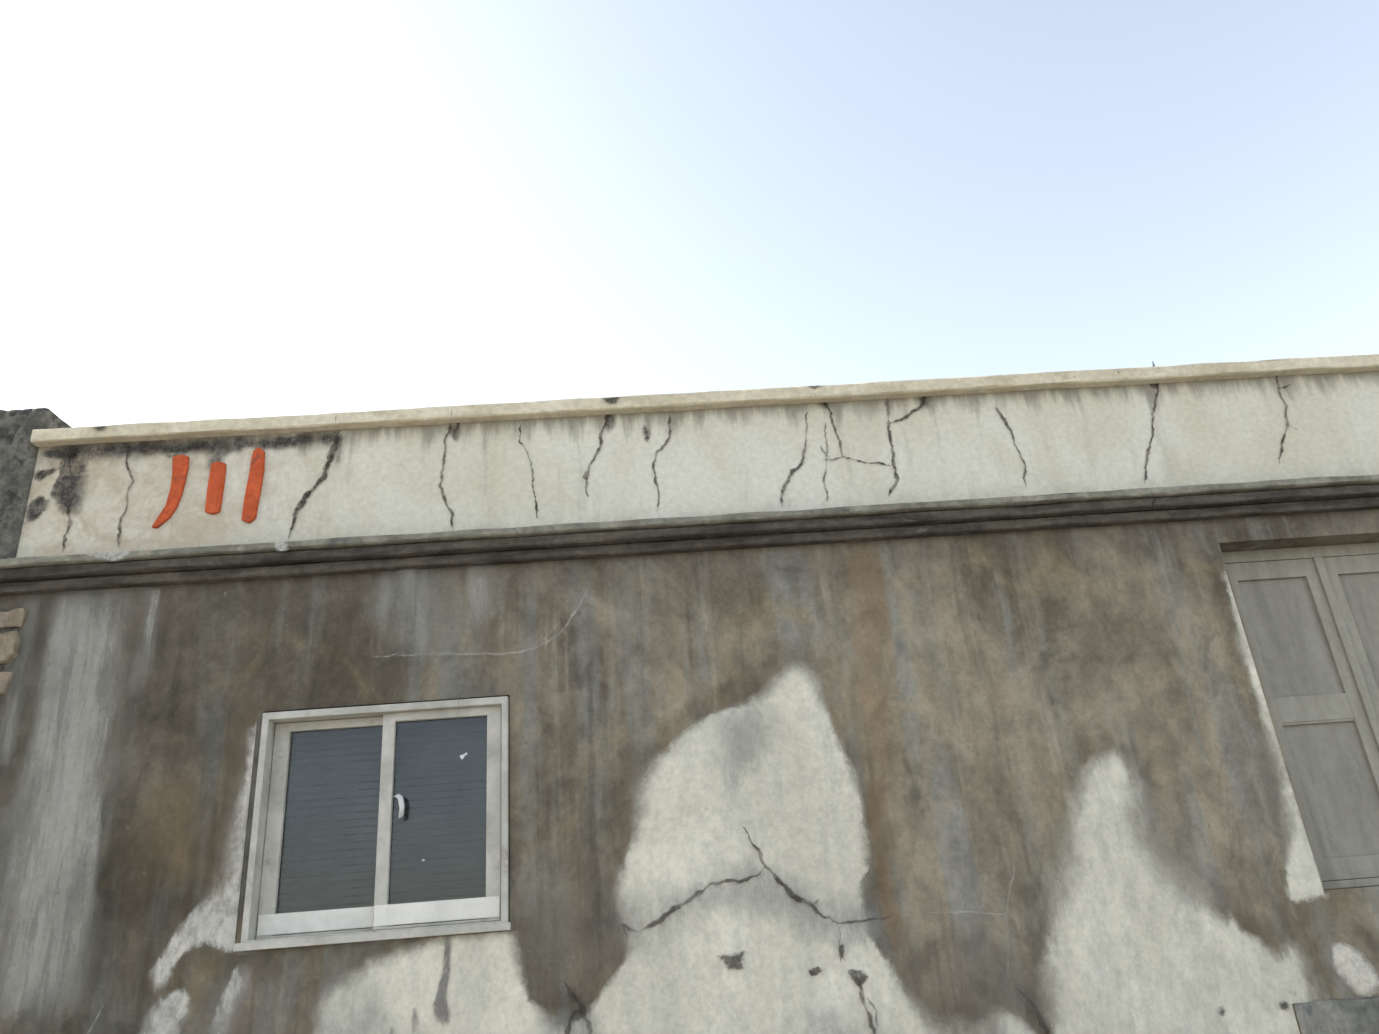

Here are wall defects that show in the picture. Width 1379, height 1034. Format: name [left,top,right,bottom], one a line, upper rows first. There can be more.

leakage [27,426,343,521]
crack [289,419,340,536]
crack [439,413,459,526]
crack [583,399,612,496]
leakage [604,397,619,429]
crack [652,418,671,510]
crack [780,388,925,503]
crack [996,408,1027,484]
crack [1144,362,1159,508]
leakage [8,601,114,1006]
leakage [434,937,450,1022]
crack [621,827,888,1034]